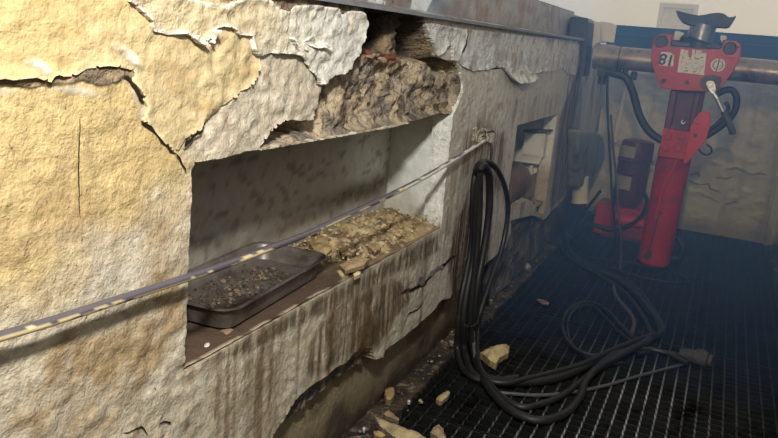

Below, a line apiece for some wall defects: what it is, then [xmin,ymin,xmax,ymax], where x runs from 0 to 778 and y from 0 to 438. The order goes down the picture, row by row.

peeling [0,0,580,153]
crack [124,75,206,171]
crack [75,125,83,213]
crack [401,256,455,314]
crack [126,421,171,435]